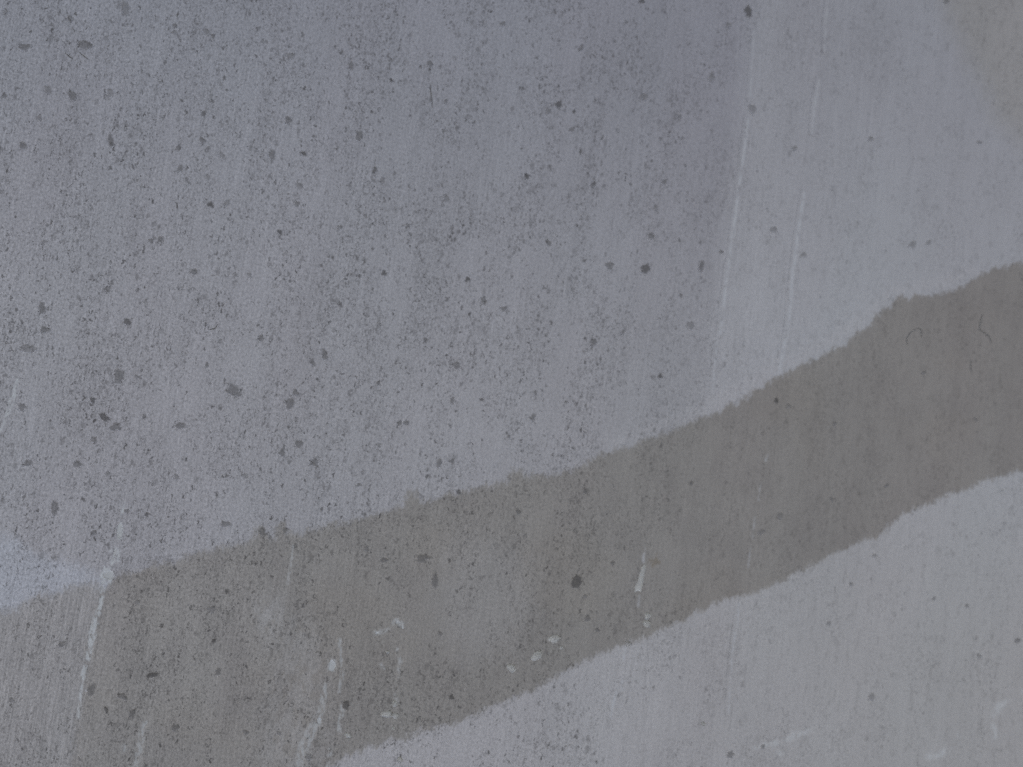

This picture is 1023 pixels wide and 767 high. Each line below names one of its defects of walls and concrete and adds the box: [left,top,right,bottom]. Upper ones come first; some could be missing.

water stain [0,0,797,767]